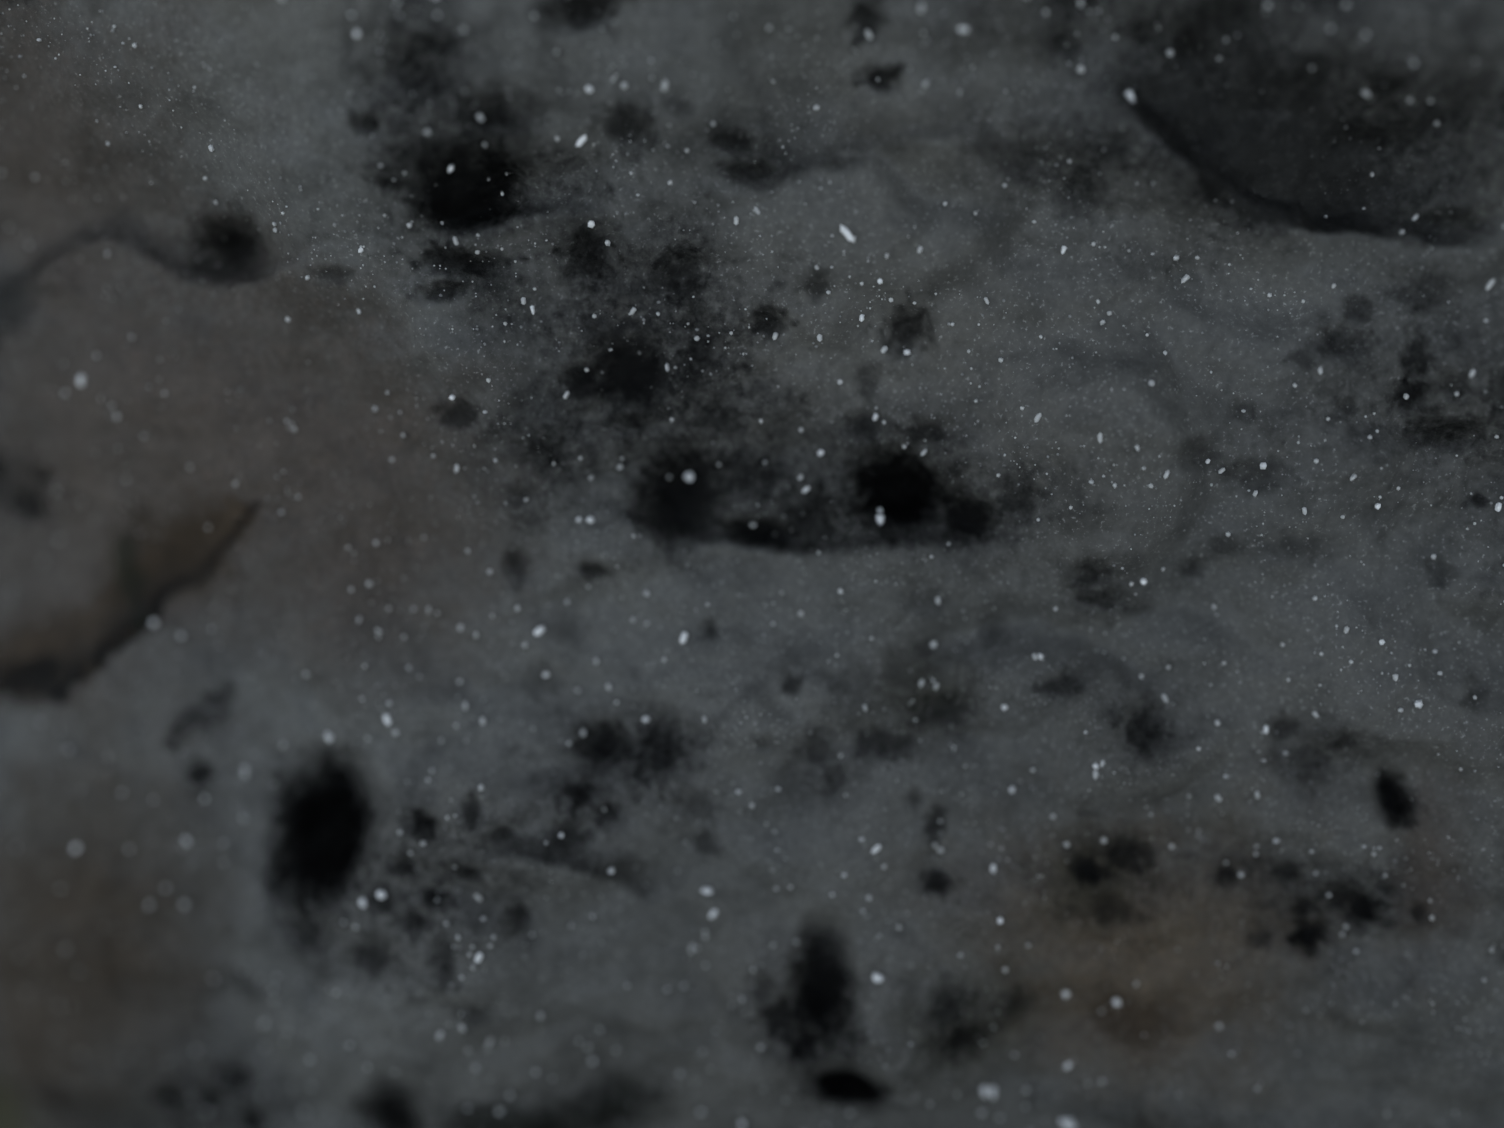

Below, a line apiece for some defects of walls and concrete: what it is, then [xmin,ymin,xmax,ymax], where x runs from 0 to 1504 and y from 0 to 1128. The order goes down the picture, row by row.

crack [0,499,251,703]
leakage [0,47,458,635]